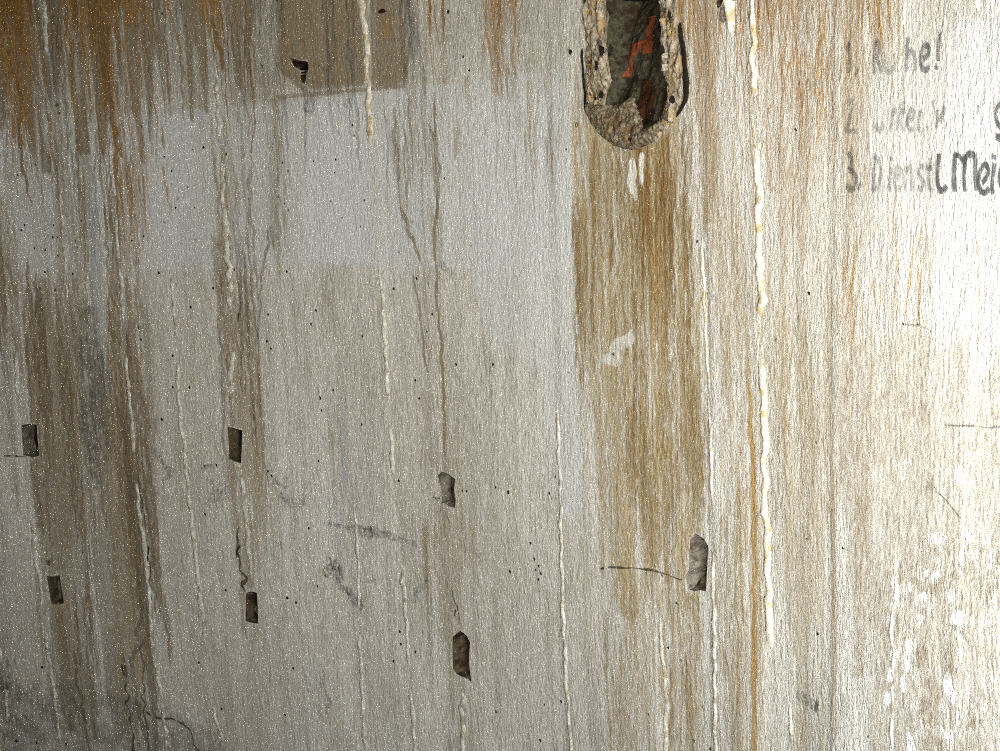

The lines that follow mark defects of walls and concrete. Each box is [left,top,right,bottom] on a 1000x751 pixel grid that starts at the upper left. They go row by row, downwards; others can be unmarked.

rust [0,0,47,192]
rust [64,0,151,259]
rust [195,0,224,69]
spalling [582,0,611,111]
rust [637,79,655,127]
spalling [650,0,684,145]
rust [679,0,708,76]
rust [720,0,863,156]
rust [876,0,900,45]
rust [628,133,675,413]
water stain [841,335,1000,644]
crack [121,660,200,751]